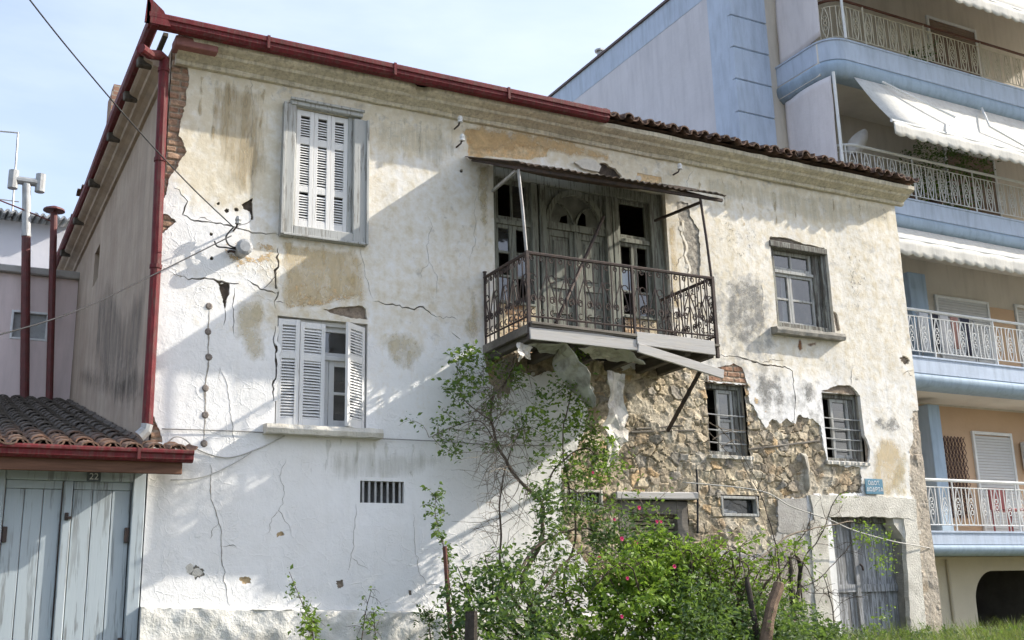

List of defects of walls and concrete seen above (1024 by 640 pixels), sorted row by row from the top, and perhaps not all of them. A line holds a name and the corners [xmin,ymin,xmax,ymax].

spalling [164,53,189,198]
damp [212,88,257,183]
spalling [466,129,549,160]
crack [173,80,283,401]
spalling [676,201,700,279]
spalling [286,281,366,319]
crack [356,249,461,339]
damp [728,283,764,341]
crack [720,352,798,424]
spalling [561,360,868,585]
spalling [185,563,204,580]
crack [210,464,235,604]